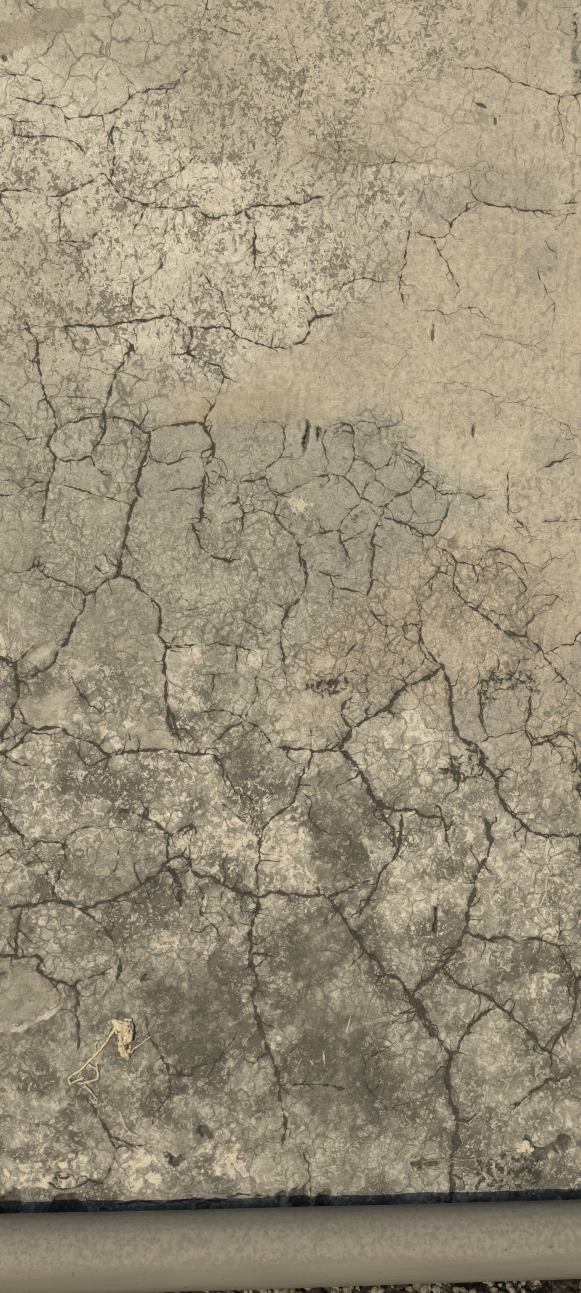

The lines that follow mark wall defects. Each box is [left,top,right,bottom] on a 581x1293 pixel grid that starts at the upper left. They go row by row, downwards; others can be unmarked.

crack [0,43,323,279]
crack [464,67,581,129]
crack [0,179,581,1203]